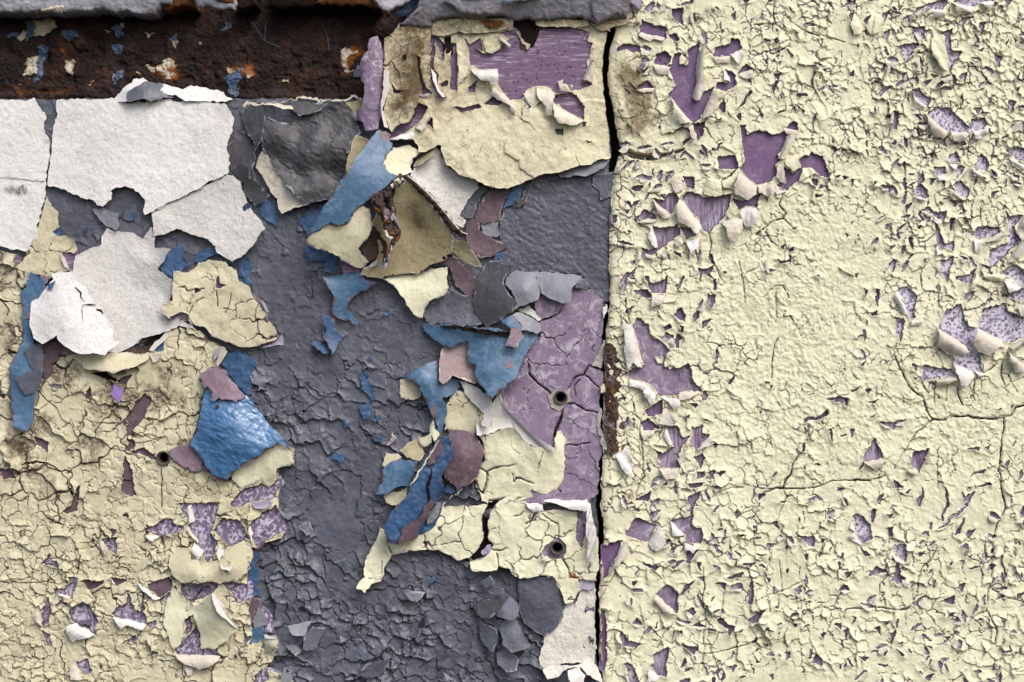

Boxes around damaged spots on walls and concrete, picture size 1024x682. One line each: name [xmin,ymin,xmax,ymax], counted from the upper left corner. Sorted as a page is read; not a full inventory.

corrosion [232,65,255,76]
crack [602,27,621,172]
peeling [616,4,753,145]
peeling [625,92,829,328]
peeling [848,0,1024,387]
peeling [0,0,717,682]
corrosion [602,343,626,457]
crack [0,460,81,595]
crack [475,465,560,538]
crack [527,299,629,682]
peeling [829,500,936,587]
crack [759,356,1024,644]